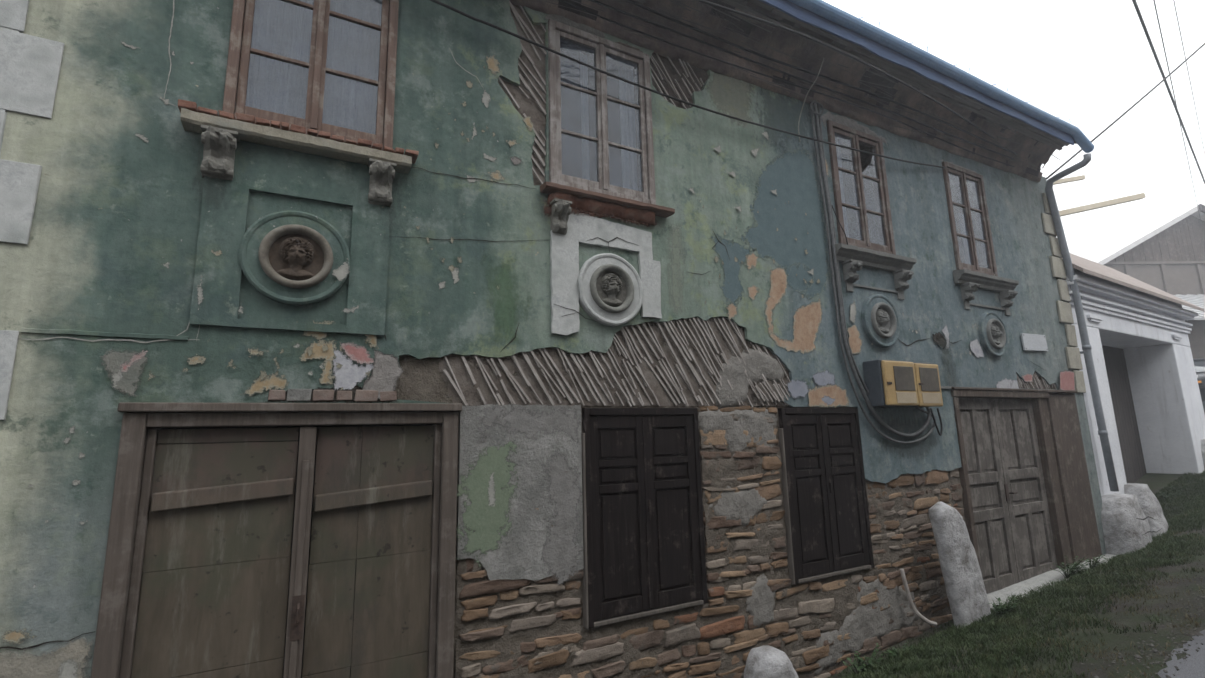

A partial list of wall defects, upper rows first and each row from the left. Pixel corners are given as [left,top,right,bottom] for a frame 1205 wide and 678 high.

peeling [711,131,831,354]
peeling [100,349,155,396]
flaking render [182,354,206,372]
flaking render [244,305,403,403]
flaking render [456,403,584,584]
flaking render [0,628,92,678]
crack [0,631,95,650]